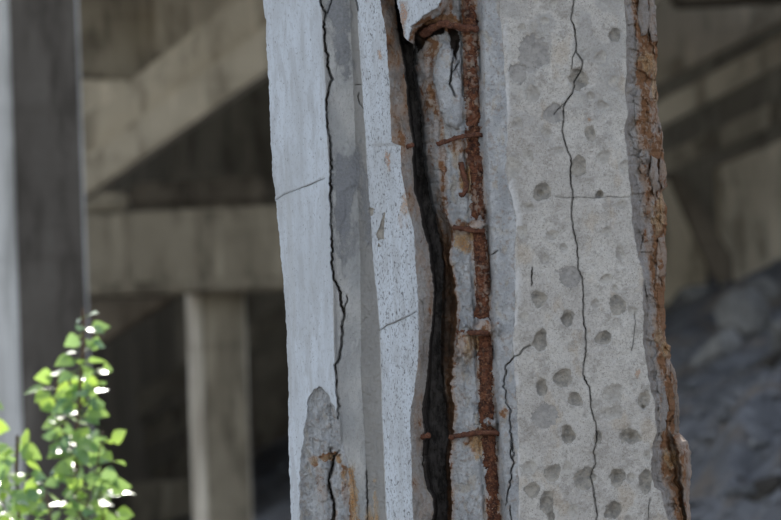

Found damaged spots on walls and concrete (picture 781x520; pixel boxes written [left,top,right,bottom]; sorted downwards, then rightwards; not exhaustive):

crack [279,0,348,416]
crack [379,0,458,520]
spalling [411,0,692,520]
spalling [299,387,356,520]
crack [328,452,338,518]
corrosion [325,455,378,520]
crack [504,346,528,518]